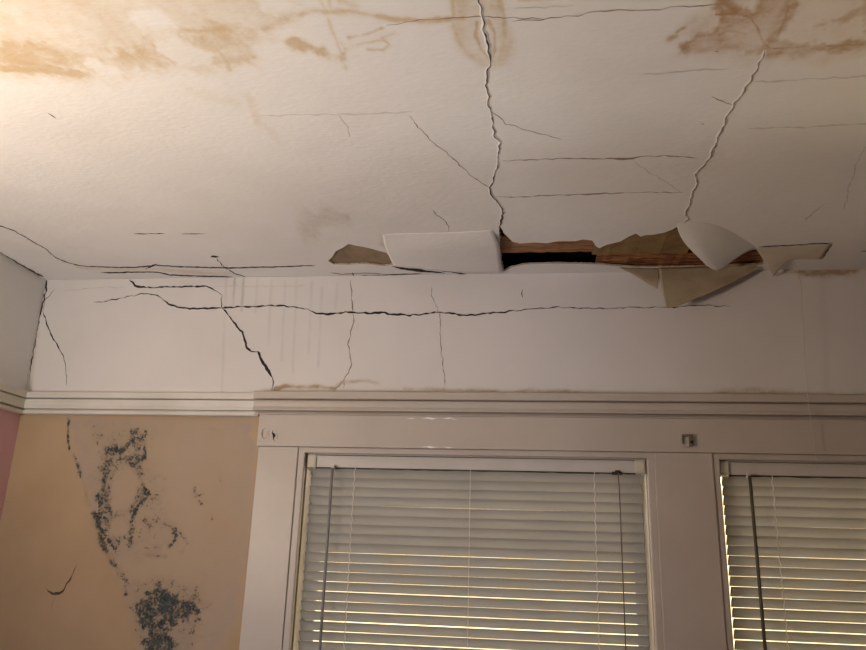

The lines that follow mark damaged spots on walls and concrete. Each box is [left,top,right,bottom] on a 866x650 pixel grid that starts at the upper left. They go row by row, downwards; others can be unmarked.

water stain [0,0,522,148]
crack [256,0,866,226]
flaking render [329,244,393,266]
crack [0,226,730,390]
flaking render [499,221,832,308]
crack [762,243,832,257]
crack [47,569,75,610]
water stain [60,415,259,650]